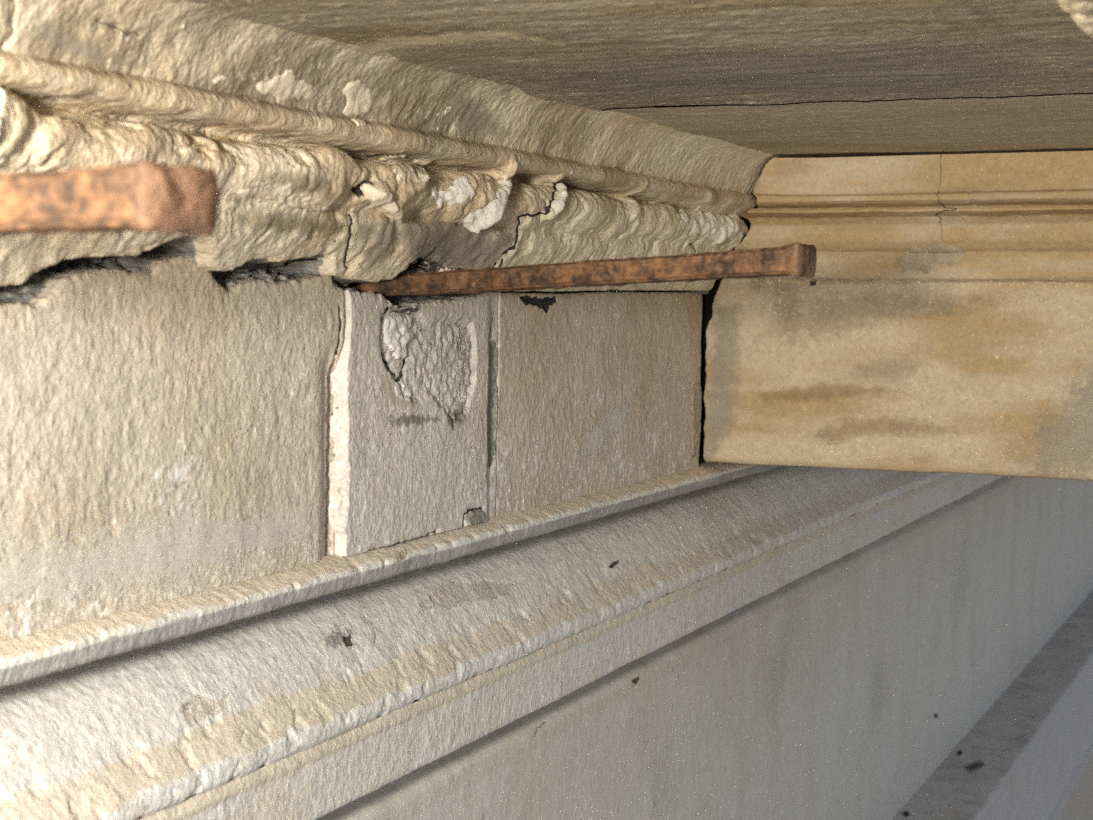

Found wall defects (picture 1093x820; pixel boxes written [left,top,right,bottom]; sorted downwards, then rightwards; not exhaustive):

crack [1,0,14,46]
peeling [256,69,318,105]
peeling [342,79,373,126]
crack [733,191,758,250]
crack [0,214,472,355]
crack [489,182,722,464]